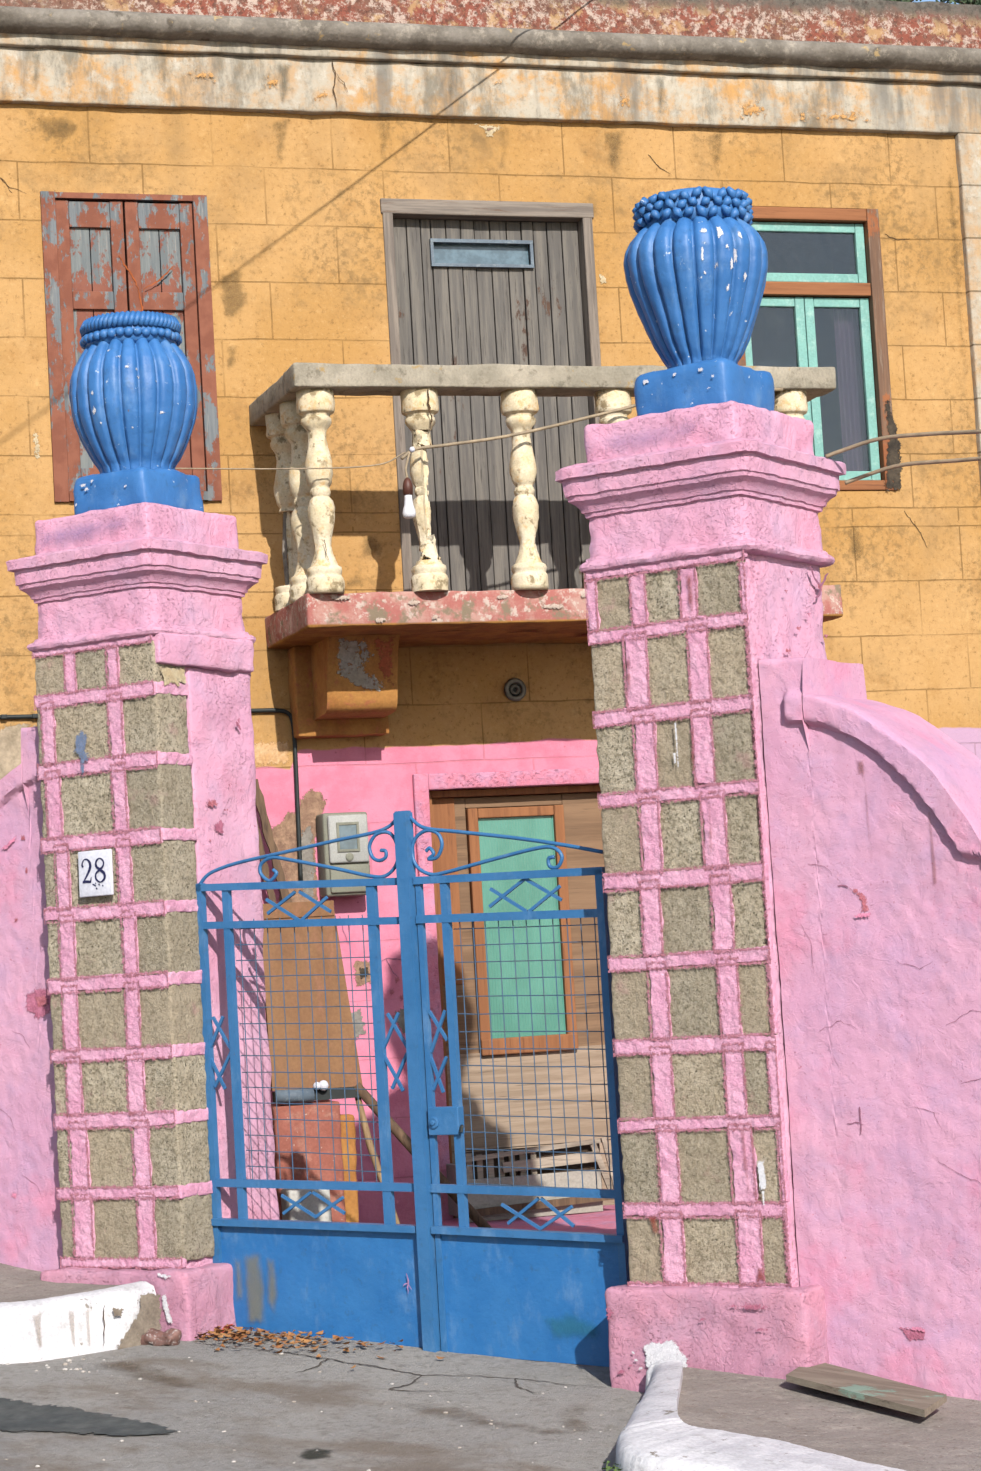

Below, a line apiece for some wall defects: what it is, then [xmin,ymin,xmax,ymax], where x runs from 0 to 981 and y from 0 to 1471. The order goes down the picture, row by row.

peeling [337,616,395,692]
crack [203,1343,606,1393]